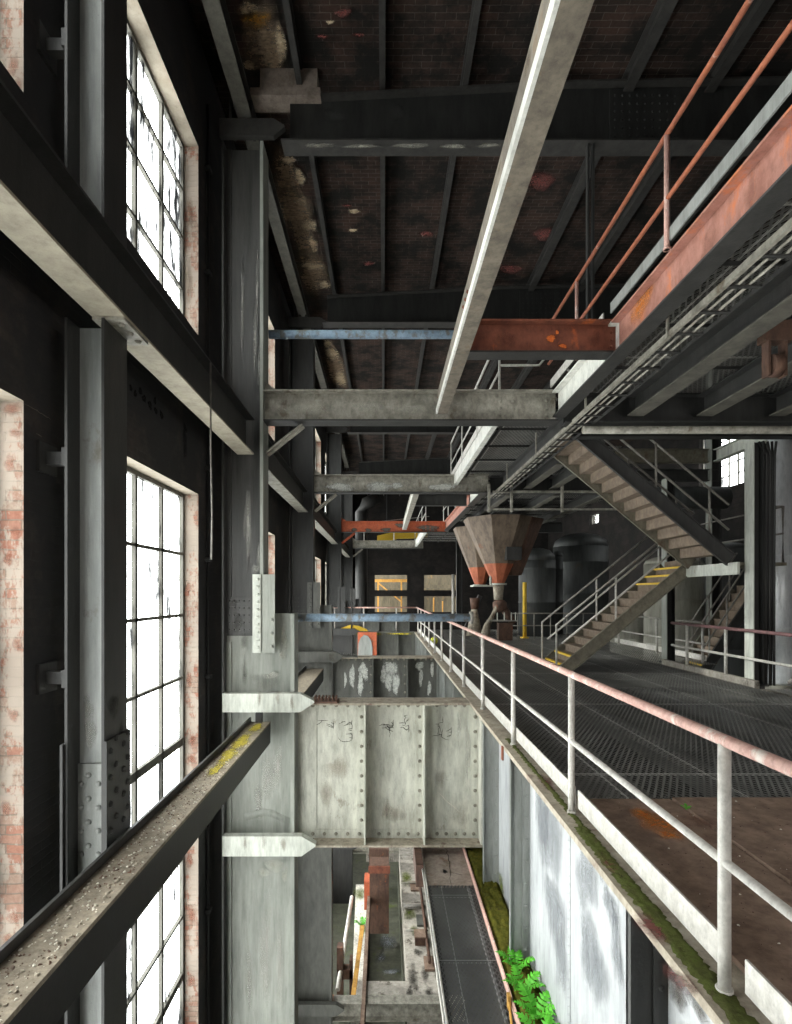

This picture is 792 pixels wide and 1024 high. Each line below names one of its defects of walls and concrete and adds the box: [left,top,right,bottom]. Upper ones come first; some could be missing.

leakage [344,662,400,696]
leakage [415,662,434,696]